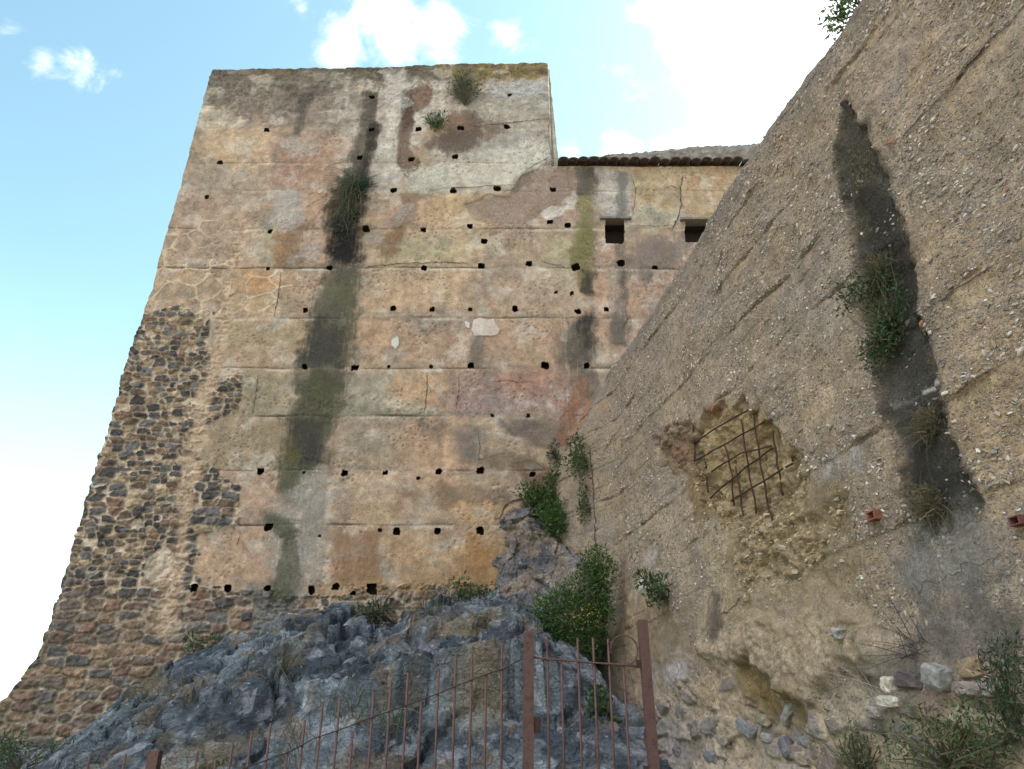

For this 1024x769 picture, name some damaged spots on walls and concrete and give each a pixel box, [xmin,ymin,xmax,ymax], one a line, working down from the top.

leakage [576,166,598,195]
leakage [244,71,451,633]
leakage [558,232,691,397]
leakage [832,100,1018,659]
spalling [661,400,849,615]